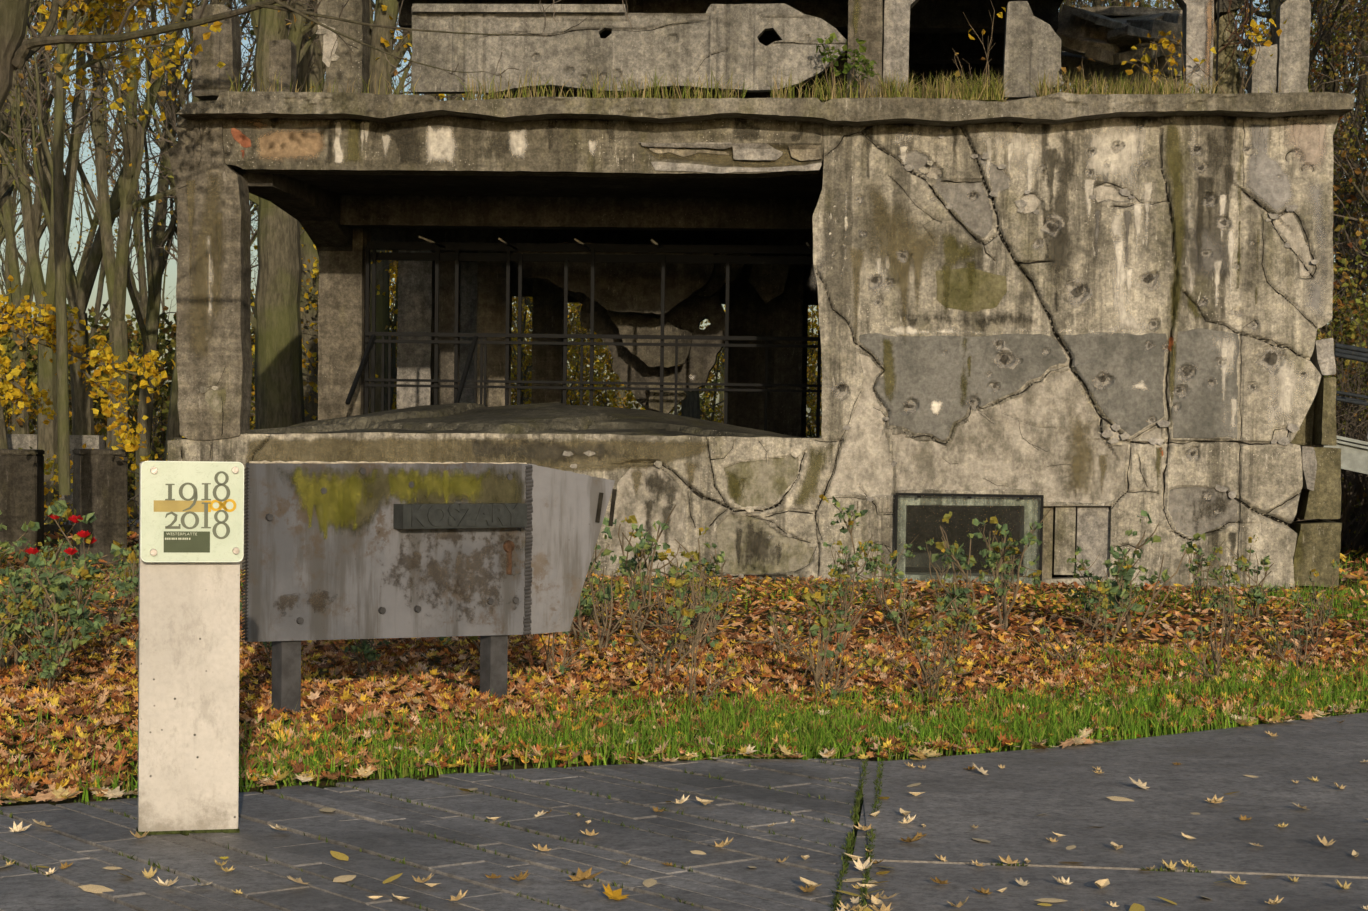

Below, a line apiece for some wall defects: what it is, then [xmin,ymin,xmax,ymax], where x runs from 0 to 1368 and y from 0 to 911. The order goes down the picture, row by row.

spalling [639,142,822,174]
leakage [852,126,873,181]
leakage [979,116,1171,333]
leakage [851,246,1032,335]
crack [662,119,1317,578]
spalling [830,353,1170,503]
leakage [247,438,708,544]